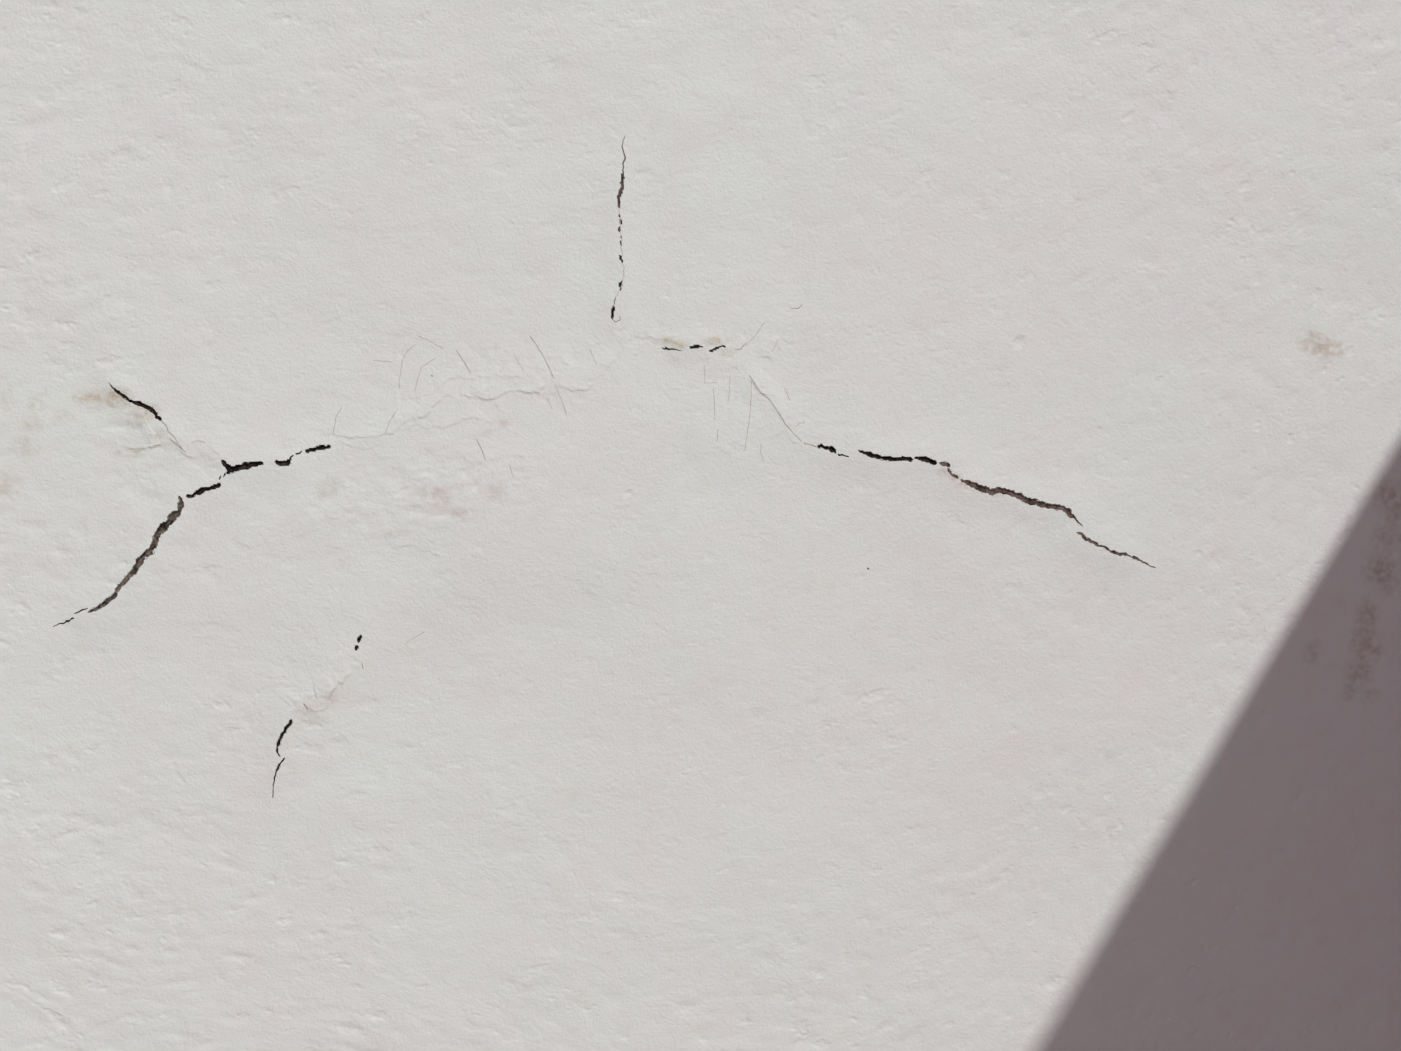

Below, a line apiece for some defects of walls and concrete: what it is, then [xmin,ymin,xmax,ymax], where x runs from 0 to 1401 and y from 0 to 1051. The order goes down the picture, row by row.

crack [611,137,626,322]
crack [661,344,726,352]
crack [109,383,182,448]
crack [53,445,330,627]
crack [805,443,1156,568]
crack [272,719,292,797]